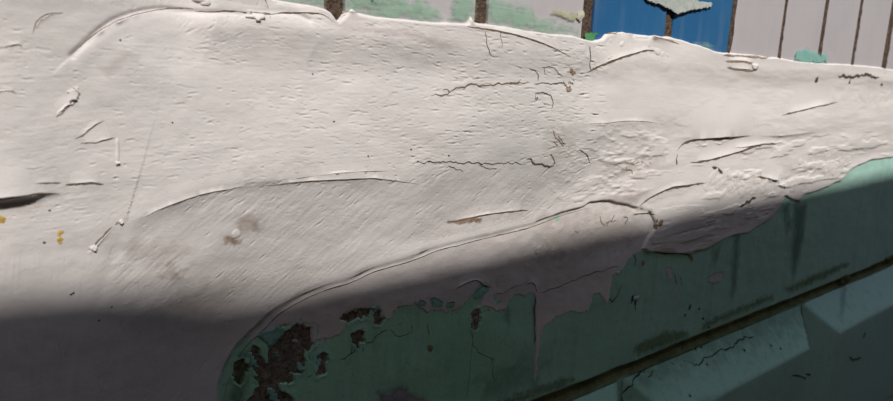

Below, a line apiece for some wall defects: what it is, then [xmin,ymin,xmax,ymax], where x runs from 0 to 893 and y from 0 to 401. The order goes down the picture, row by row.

crack [431,66,563,107]
flaking render [264,159,416,186]
flaking render [610,101,787,215]
flaking render [215,196,588,401]
crack [622,336,753,401]